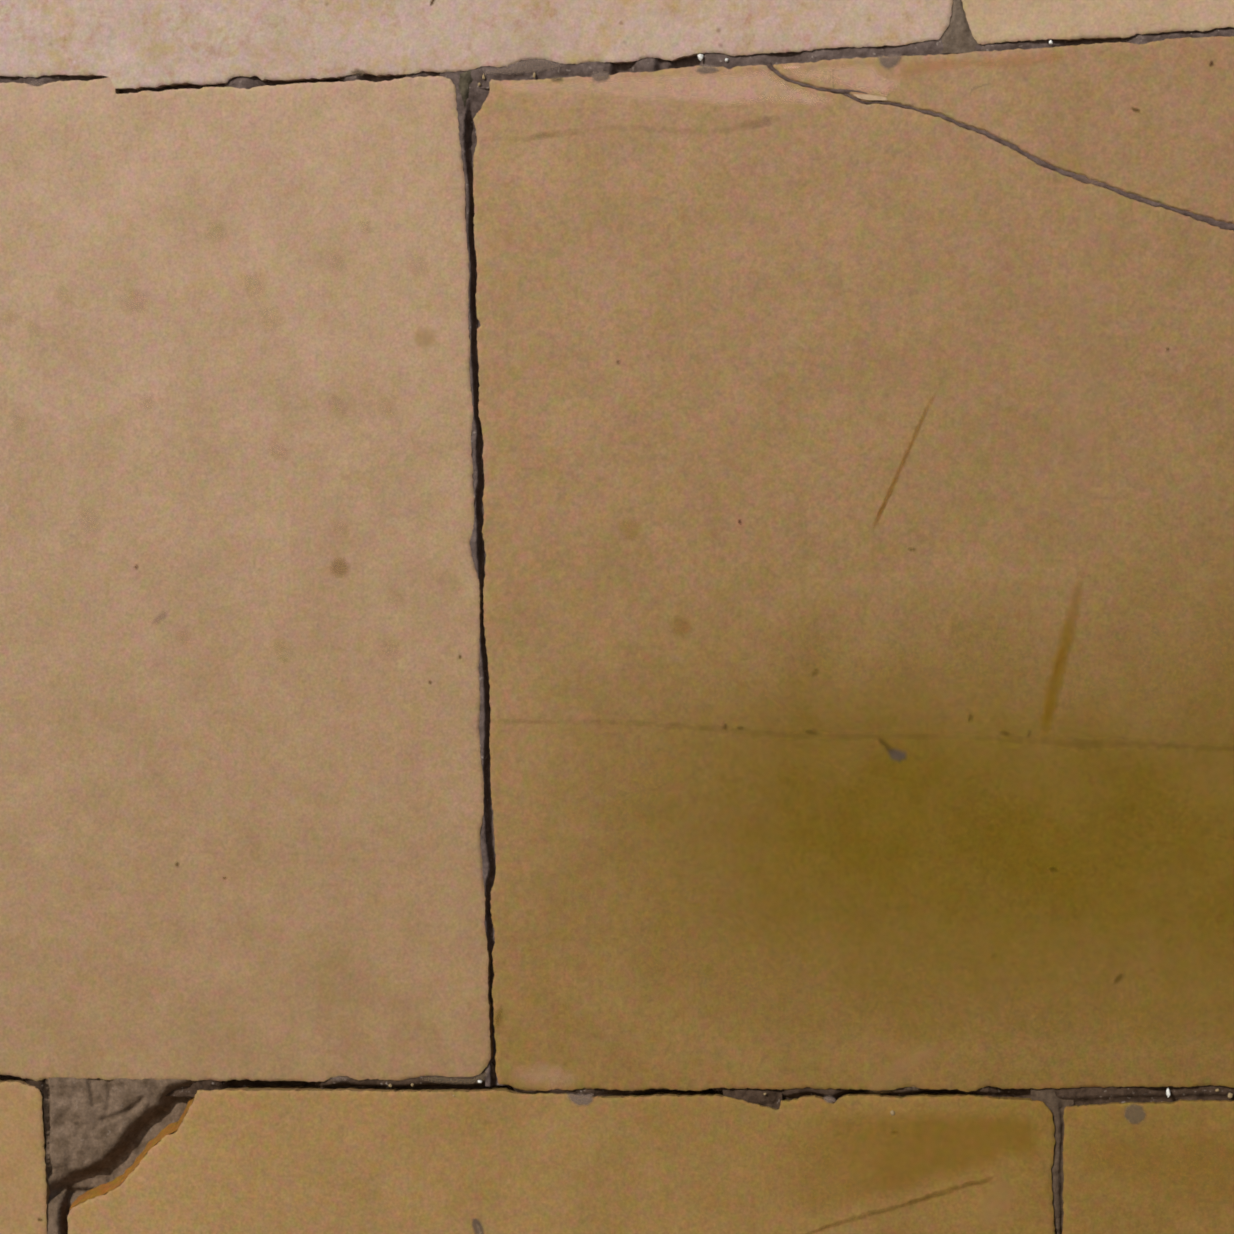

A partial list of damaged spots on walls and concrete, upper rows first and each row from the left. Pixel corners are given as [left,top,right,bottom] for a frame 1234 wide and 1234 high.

crack [767,62,1234,231]
water stain [756,740,1234,933]
spalling [38,1077,197,1234]